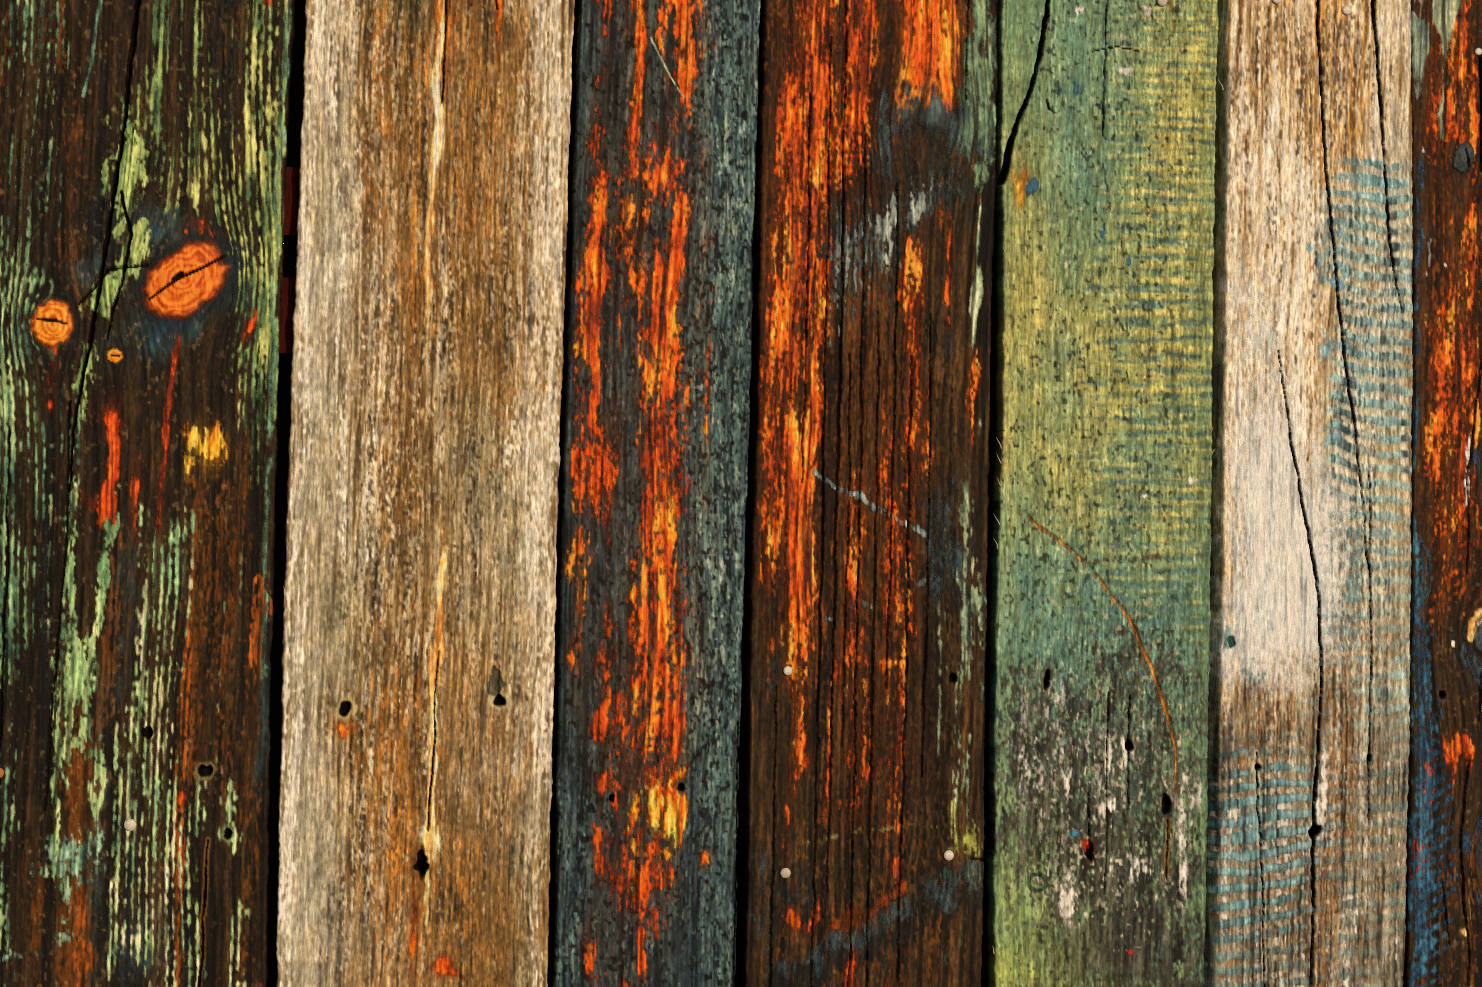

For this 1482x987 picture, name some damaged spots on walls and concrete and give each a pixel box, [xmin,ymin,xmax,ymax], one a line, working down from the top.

peeling [0,0,291,987]
peeling [566,0,711,987]
peeling [786,857,907,987]
peeling [758,0,997,858]
crack [996,0,1049,185]
peeling [1019,0,1482,987]
crack [1277,350,1323,987]
crack [1315,0,1372,824]
crack [1370,0,1401,309]